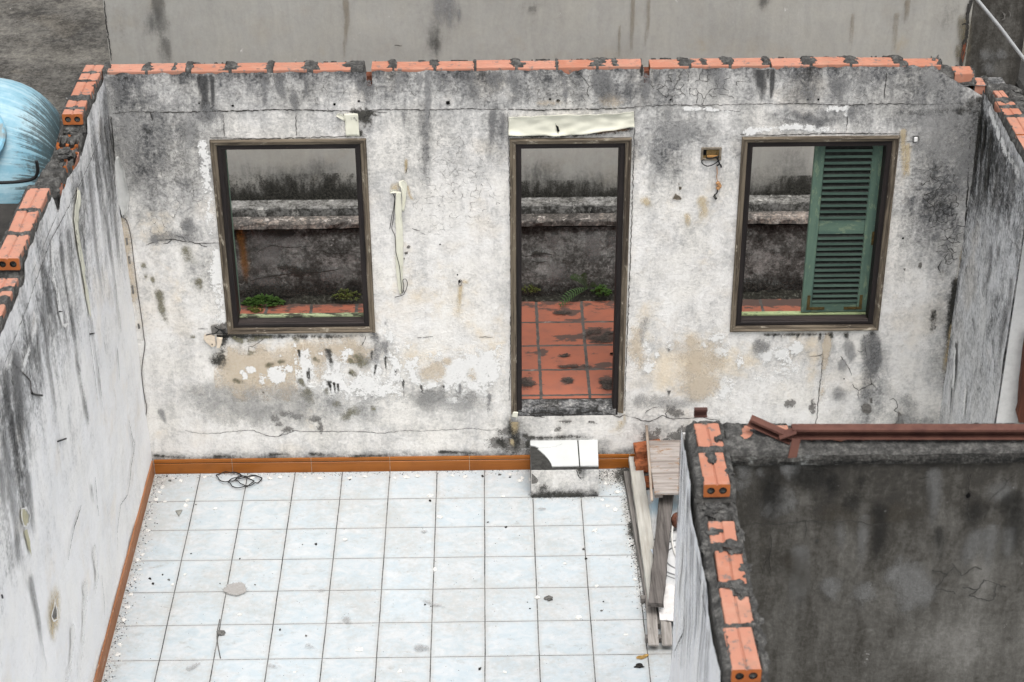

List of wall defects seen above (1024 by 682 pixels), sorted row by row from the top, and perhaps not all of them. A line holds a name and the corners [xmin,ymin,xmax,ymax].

water stain [185,75,223,148]
water stain [909,68,1014,202]
peeling [197,139,502,434]
crack [2,69,983,424]
water stain [5,283,55,453]
water stain [211,333,405,420]
water stain [753,331,882,397]
water stain [0,434,20,559]
water stain [30,577,41,634]
crack [932,563,1006,601]